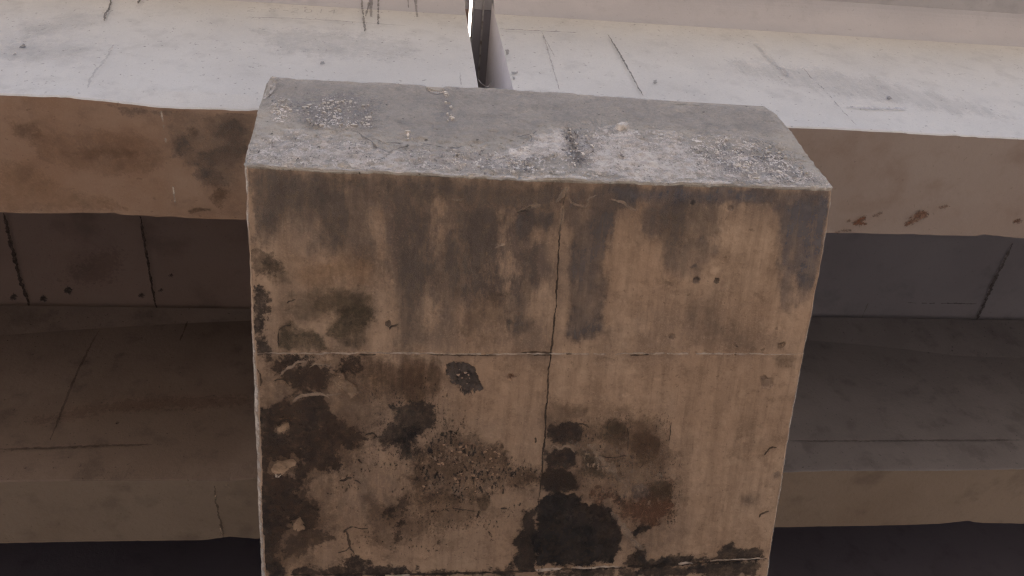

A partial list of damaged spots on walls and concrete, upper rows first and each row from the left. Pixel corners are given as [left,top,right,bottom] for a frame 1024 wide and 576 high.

damp [174,119,828,342]
damp [253,284,764,576]